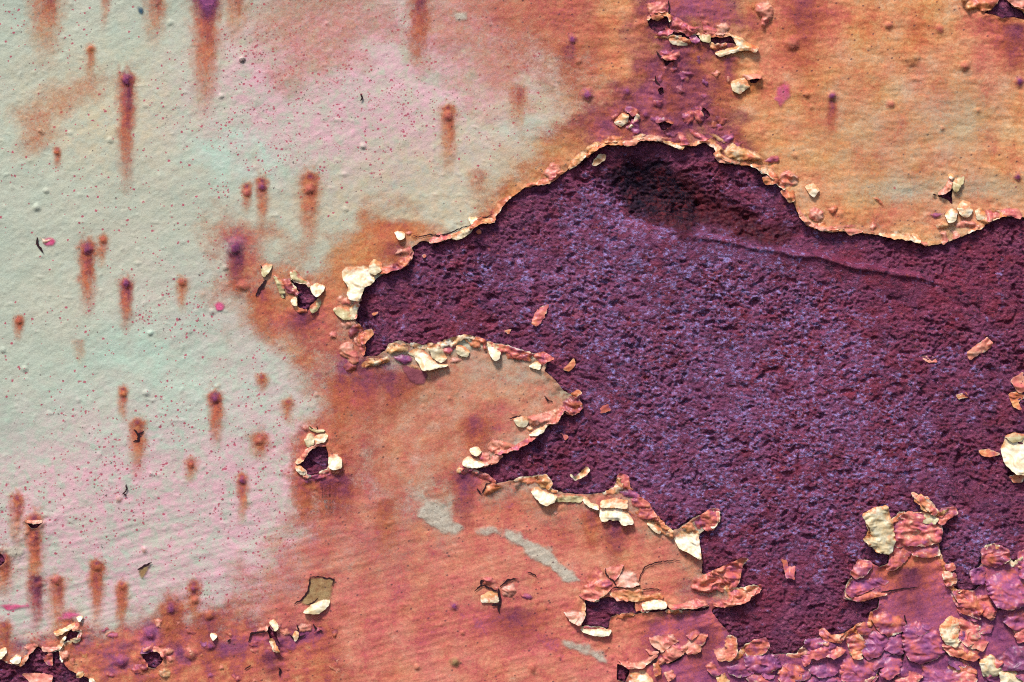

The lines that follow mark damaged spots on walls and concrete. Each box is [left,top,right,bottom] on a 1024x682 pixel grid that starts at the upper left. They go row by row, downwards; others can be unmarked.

corrosion [193,0,241,90]
peeling [647,1,759,72]
corrosion [119,72,135,163]
corrosion [410,0,1024,246]
corrosion [301,171,318,226]
peeling [261,263,325,313]
peeling [295,426,344,485]
corrosion [0,211,755,682]
peeling [329,129,1024,682]
peeling [0,616,95,682]
peeling [243,599,338,655]
corrosion [764,544,1024,682]